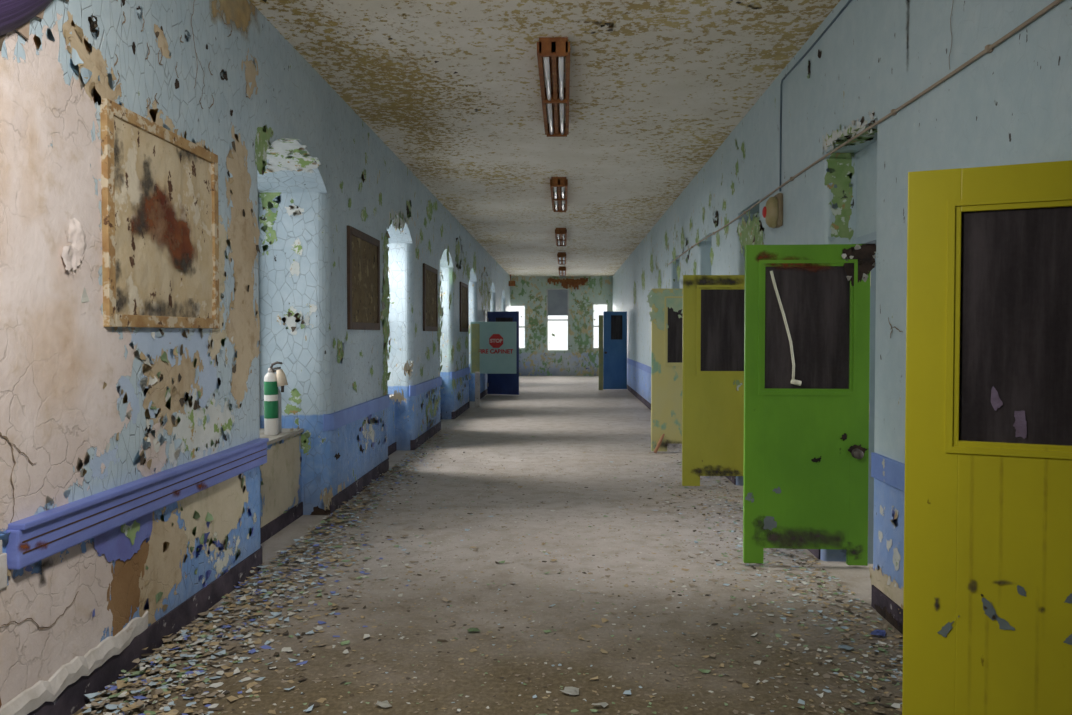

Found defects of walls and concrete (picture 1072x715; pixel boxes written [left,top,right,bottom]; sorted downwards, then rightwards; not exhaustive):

flaking render [0,0,320,547]
peeling [250,0,510,431]
peeling [822,108,877,286]
crack [0,432,35,523]
peeling [357,414,388,453]
crack [0,592,78,629]